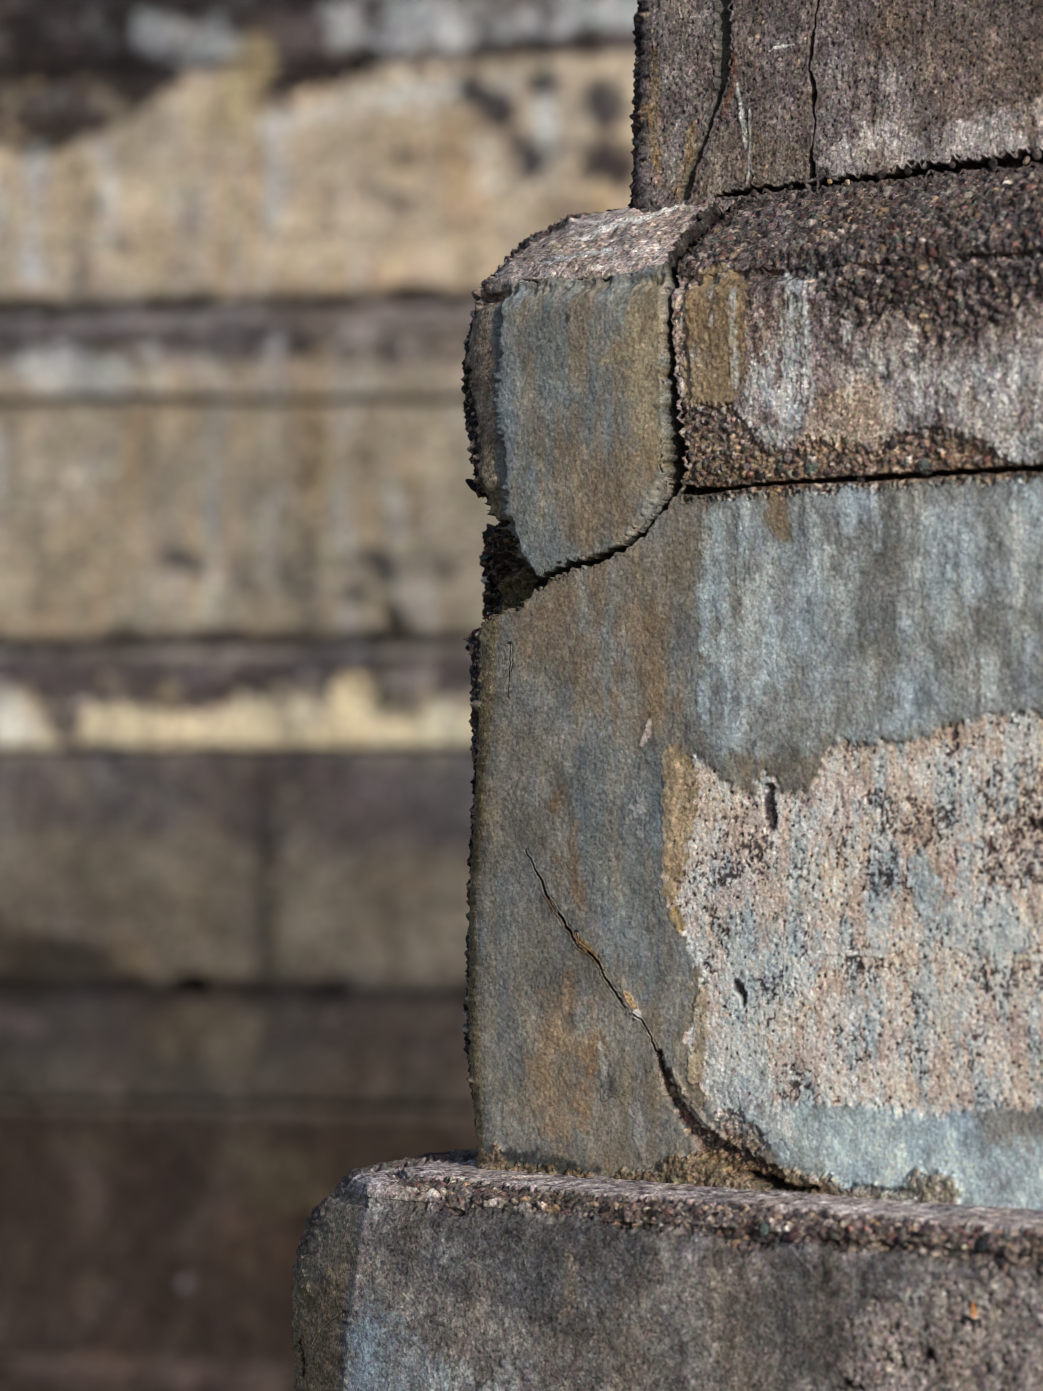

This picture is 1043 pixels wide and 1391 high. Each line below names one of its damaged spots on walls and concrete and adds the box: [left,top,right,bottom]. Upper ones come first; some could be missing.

crack [803,0,826,191]
crack [524,849,672,1085]
peeling [384,708,1043,1391]